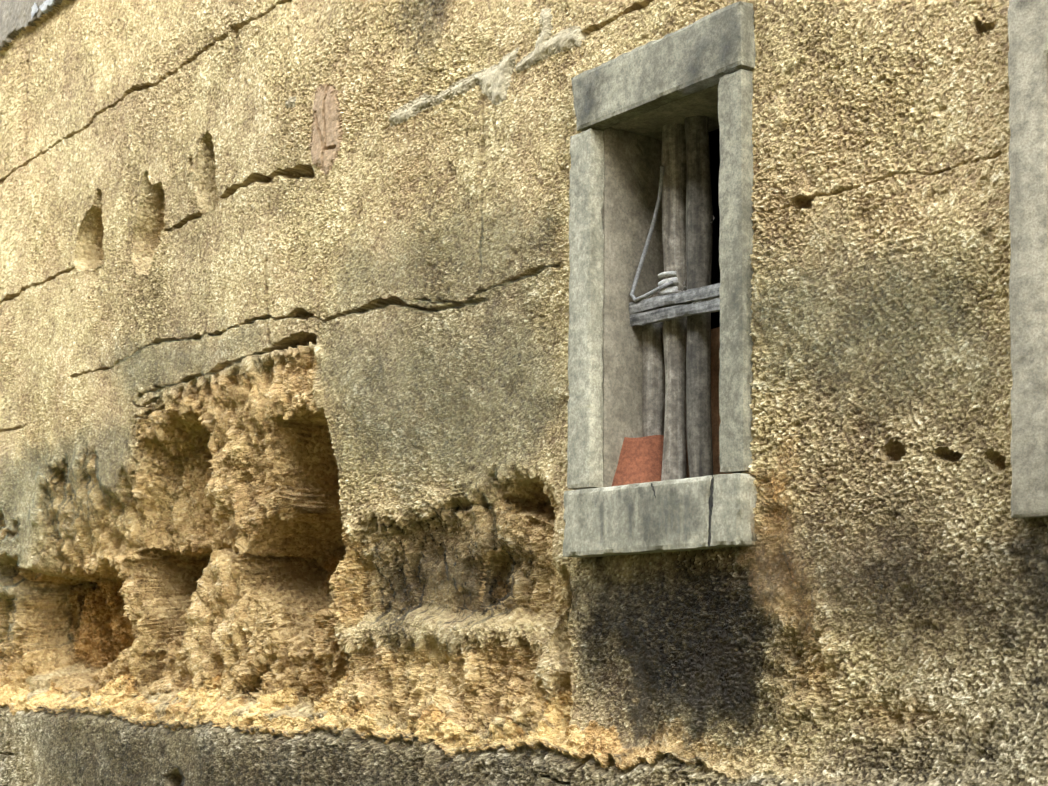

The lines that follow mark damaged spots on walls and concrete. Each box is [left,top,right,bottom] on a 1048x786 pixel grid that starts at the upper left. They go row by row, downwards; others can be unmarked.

crack [582,0,654,34]
crack [0,0,292,181]
crack [166,164,315,231]
crack [769,151,1002,213]
crack [0,266,75,305]
crack [70,261,563,417]
spalling [882,439,907,463]
spalling [932,446,962,462]
spalling [983,449,1006,473]
spalling [0,331,574,744]
spalling [748,462,1009,749]
spalling [166,768,185,786]